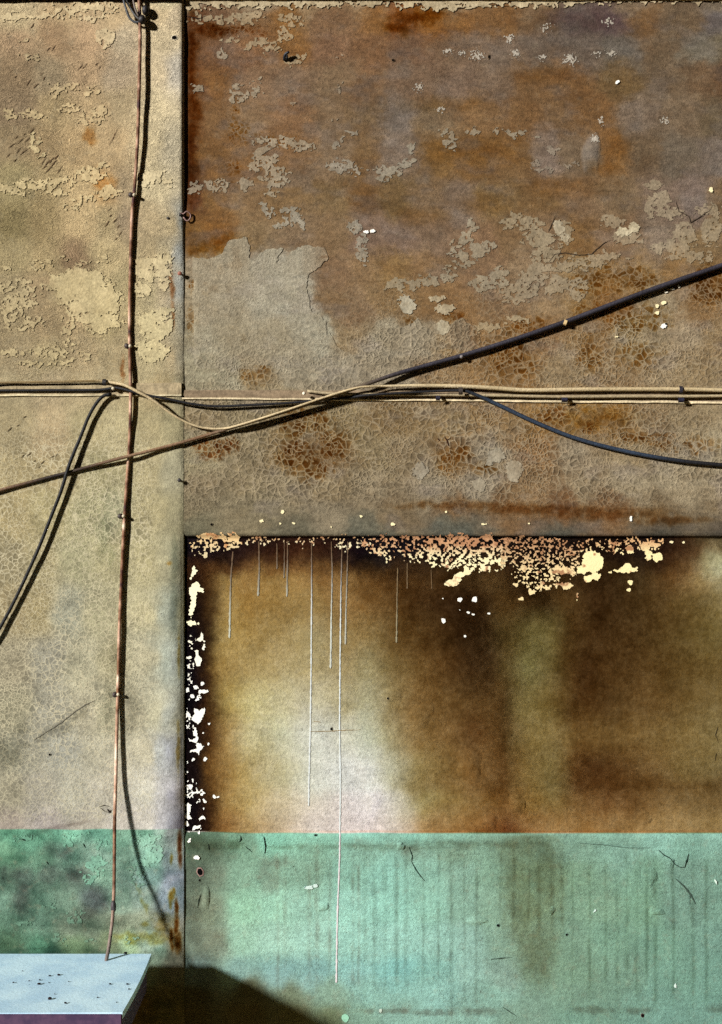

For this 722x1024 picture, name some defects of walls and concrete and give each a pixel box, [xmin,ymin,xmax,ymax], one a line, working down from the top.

peeling [0,1,119,50]
peeling [3,82,110,159]
peeling [0,161,123,212]
peeling [132,170,172,188]
peeling [0,252,175,369]
flaking render [192,179,722,369]
corrosion [693,274,722,304]
corrosion [278,413,342,477]
peeling [185,522,685,843]
water stain [205,537,722,982]
corrosion [170,895,180,949]